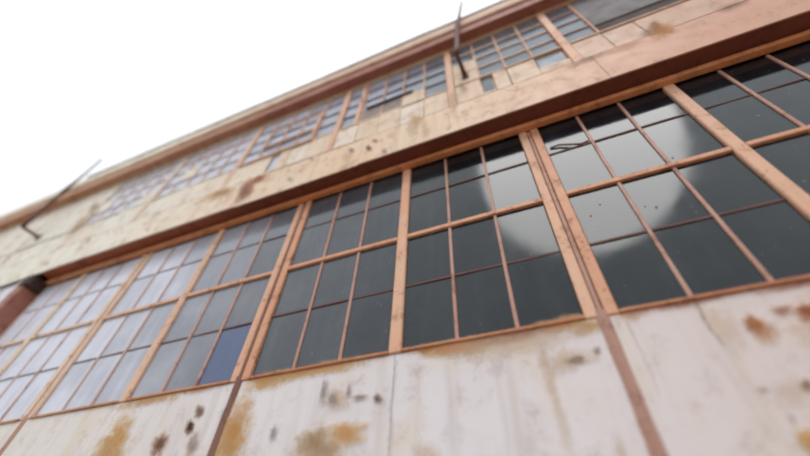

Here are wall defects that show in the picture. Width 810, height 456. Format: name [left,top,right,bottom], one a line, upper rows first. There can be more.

corrosion [650,22,673,36]
corrosion [776,304,810,320]
corrosion [745,316,769,337]
corrosion [797,430,810,449]